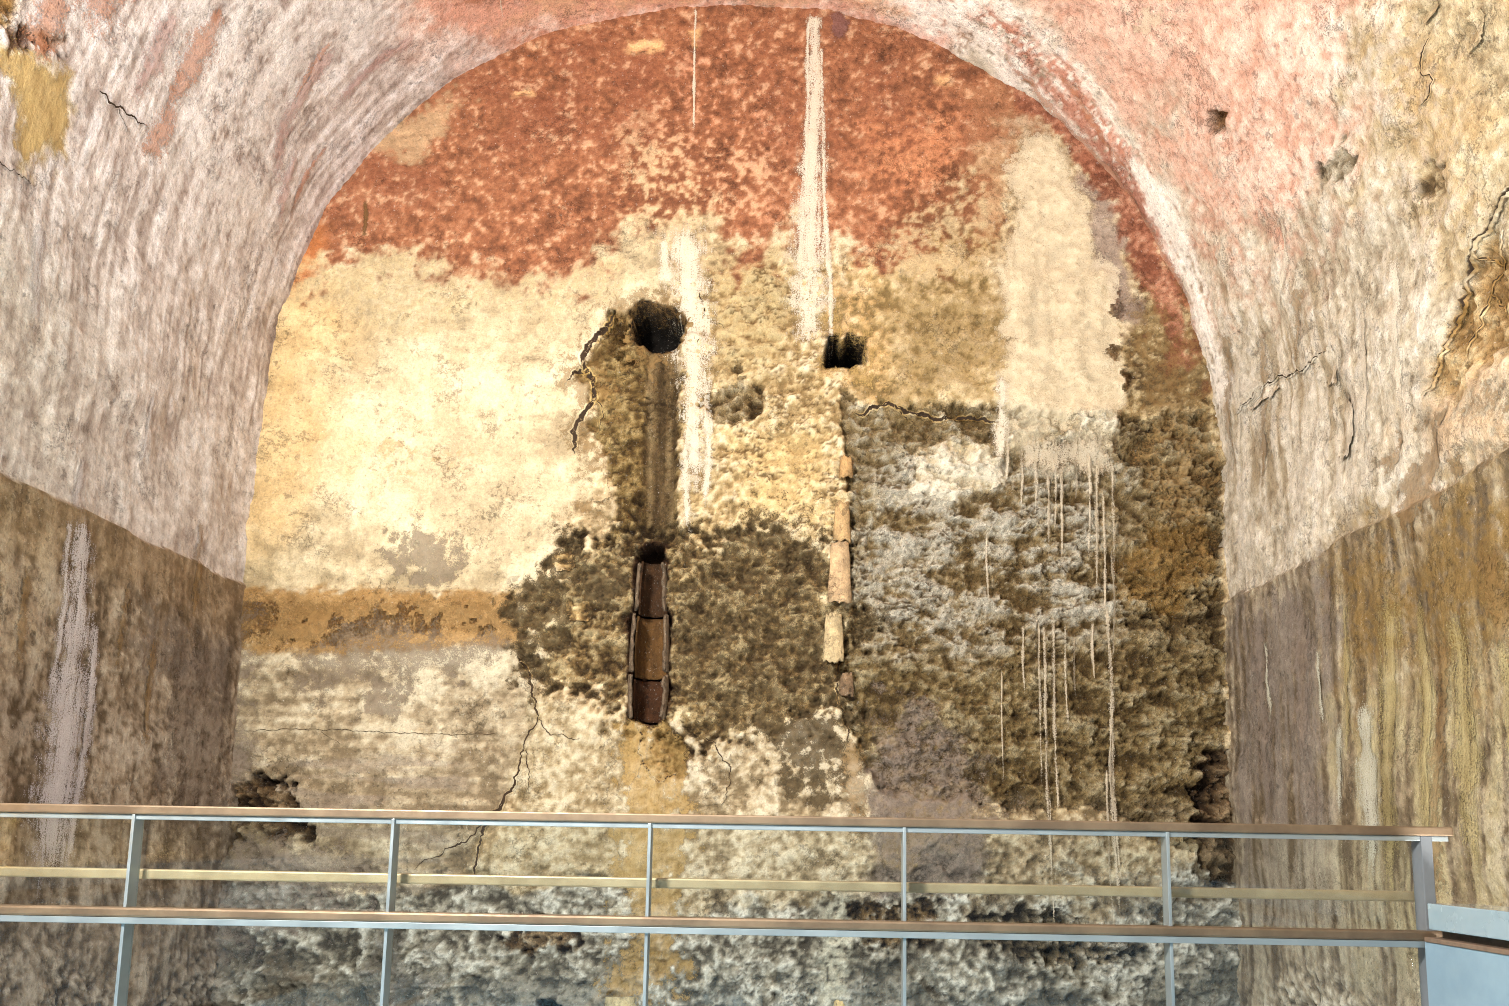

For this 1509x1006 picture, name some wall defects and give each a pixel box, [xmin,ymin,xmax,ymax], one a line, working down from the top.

crack [567,315,616,454]
water stain [773,11,850,365]
crack [853,400,998,426]
water stain [1384,251,1406,420]
crack [1420,186,1509,396]
water stain [0,569,33,665]
water stain [20,459,130,900]
spalling [229,773,317,850]
crack [236,654,579,874]
water stain [143,217,1025,1006]
spalling [499,310,1236,888]
water stain [991,273,1271,924]